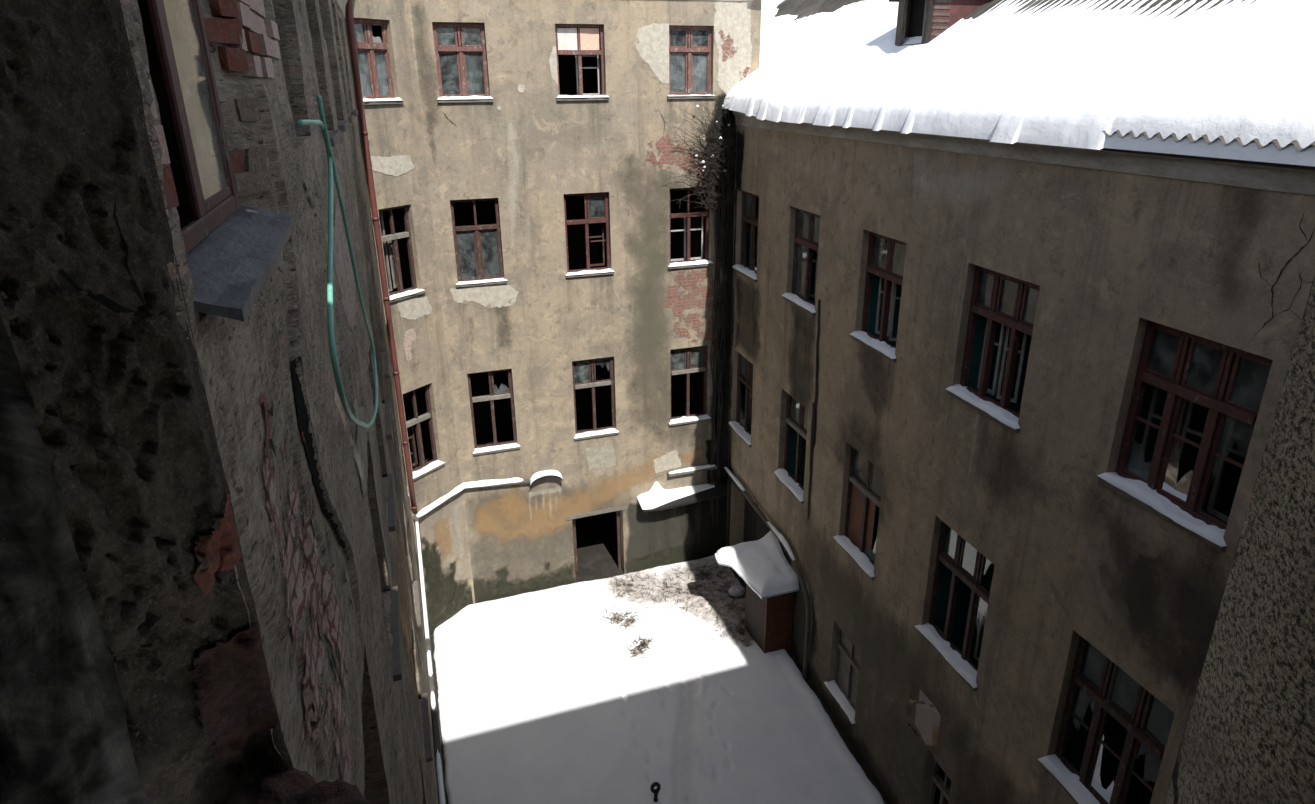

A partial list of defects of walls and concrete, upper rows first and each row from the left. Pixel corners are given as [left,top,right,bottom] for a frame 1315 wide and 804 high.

flaking render [175,0,281,78]
peeling [634,23,669,84]
peeling [713,1,752,95]
peeling [371,155,415,176]
peeling [450,284,518,309]
crack [1251,212,1315,340]
leakage [353,130,456,659]
leakage [626,94,1009,804]
peeling [220,391,371,804]
leakage [473,491,611,592]
leakage [1109,526,1225,688]
spalling [189,622,279,763]